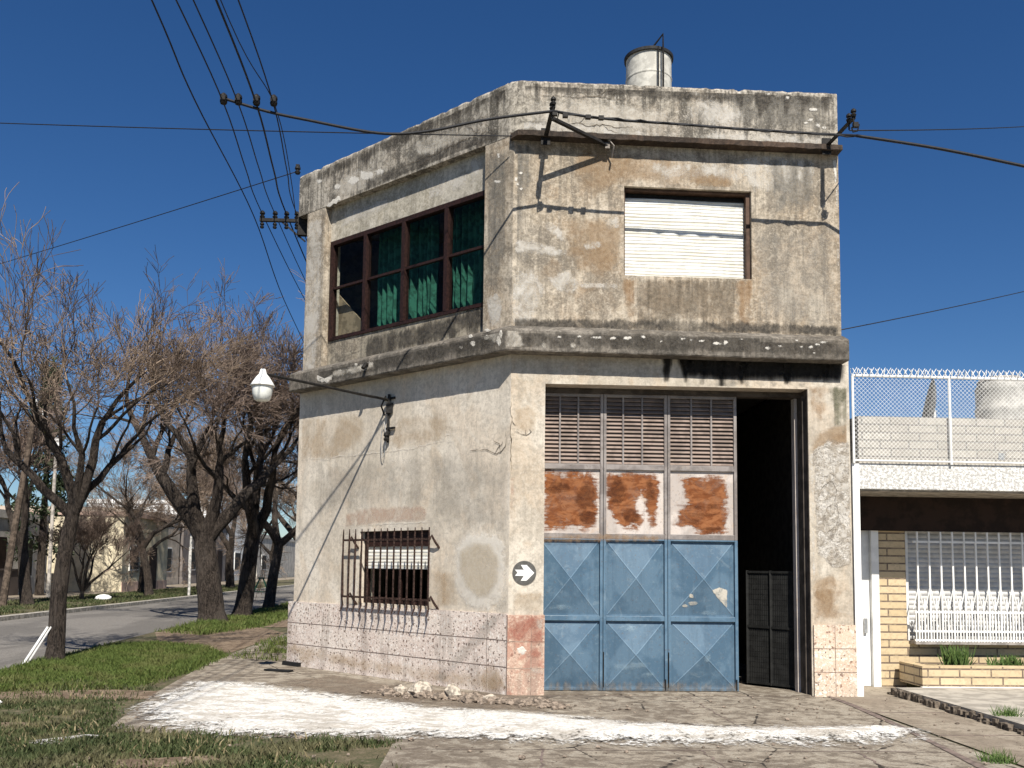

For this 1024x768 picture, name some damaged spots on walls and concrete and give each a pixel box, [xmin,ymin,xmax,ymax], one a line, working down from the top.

water stain [388,90,505,145]
water stain [526,83,831,140]
water stain [306,146,375,182]
water stain [367,131,498,188]
water stain [429,160,481,196]
water stain [345,200,387,224]
water stain [516,228,562,255]
water stain [509,272,846,424]
rust [544,469,660,531]
rust [676,475,728,535]
peeling [810,439,851,572]